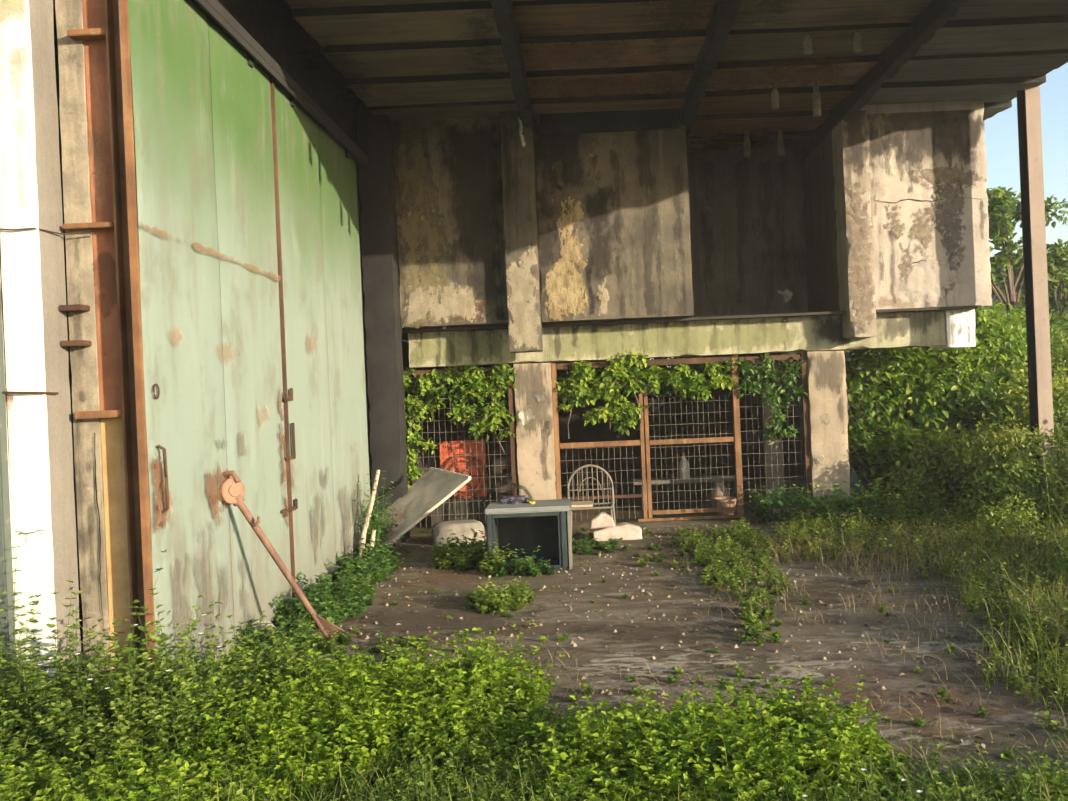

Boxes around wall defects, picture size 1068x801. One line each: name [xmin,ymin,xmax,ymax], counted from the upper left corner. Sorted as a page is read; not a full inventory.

damp [844,110,984,175]
corrosion [193,242,280,281]
damp [439,123,504,320]
damp [518,117,583,266]
spalling [506,162,610,350]
damp [585,188,613,314]
crack [874,187,976,272]
corrosion [152,457,171,532]
corrosion [206,466,230,524]